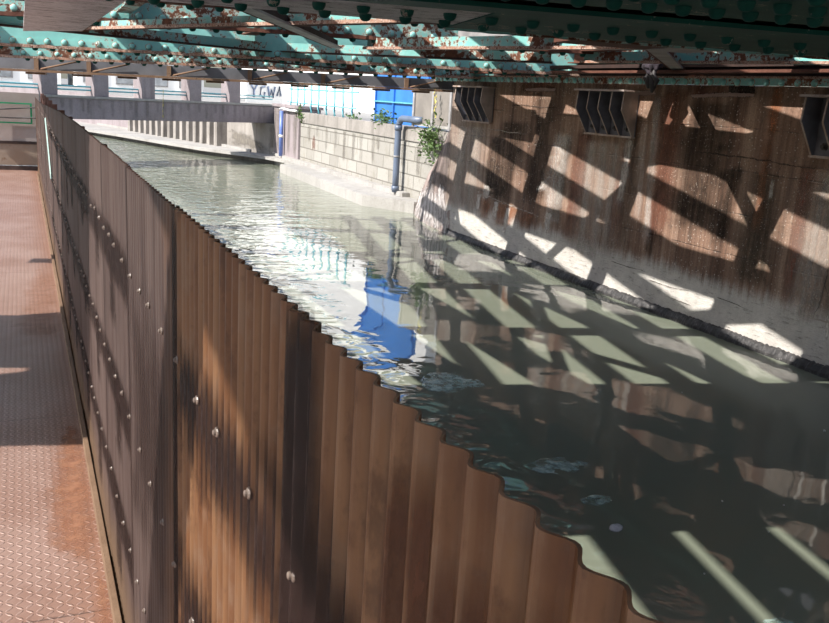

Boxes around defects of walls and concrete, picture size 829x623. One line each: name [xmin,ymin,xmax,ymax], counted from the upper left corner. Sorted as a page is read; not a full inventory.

damp [469,100,552,232]
damp [180,366,281,623]
corrosion [279,345,316,623]